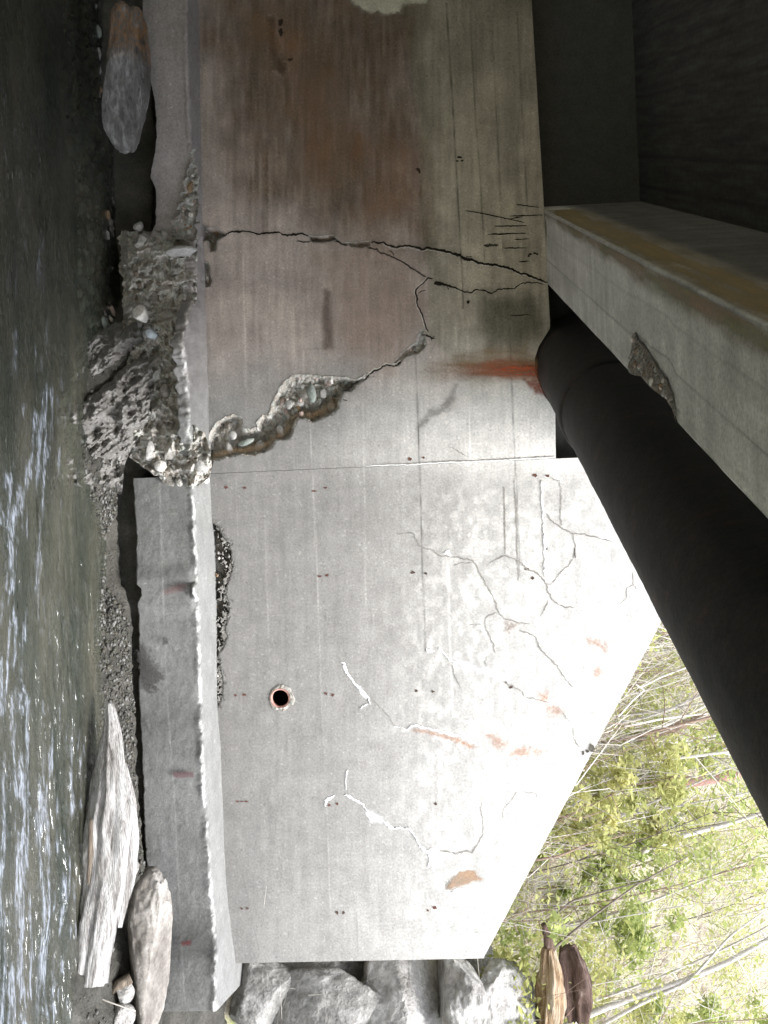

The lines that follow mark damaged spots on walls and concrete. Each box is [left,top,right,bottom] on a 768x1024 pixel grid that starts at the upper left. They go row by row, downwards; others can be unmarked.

spalling [117,148,371,487]
crack [223,230,548,341]
spalling [393,329,427,367]
rust [450,351,544,394]
spalling [628,333,676,418]
crack [366,447,612,747]
crack [439,792,539,855]